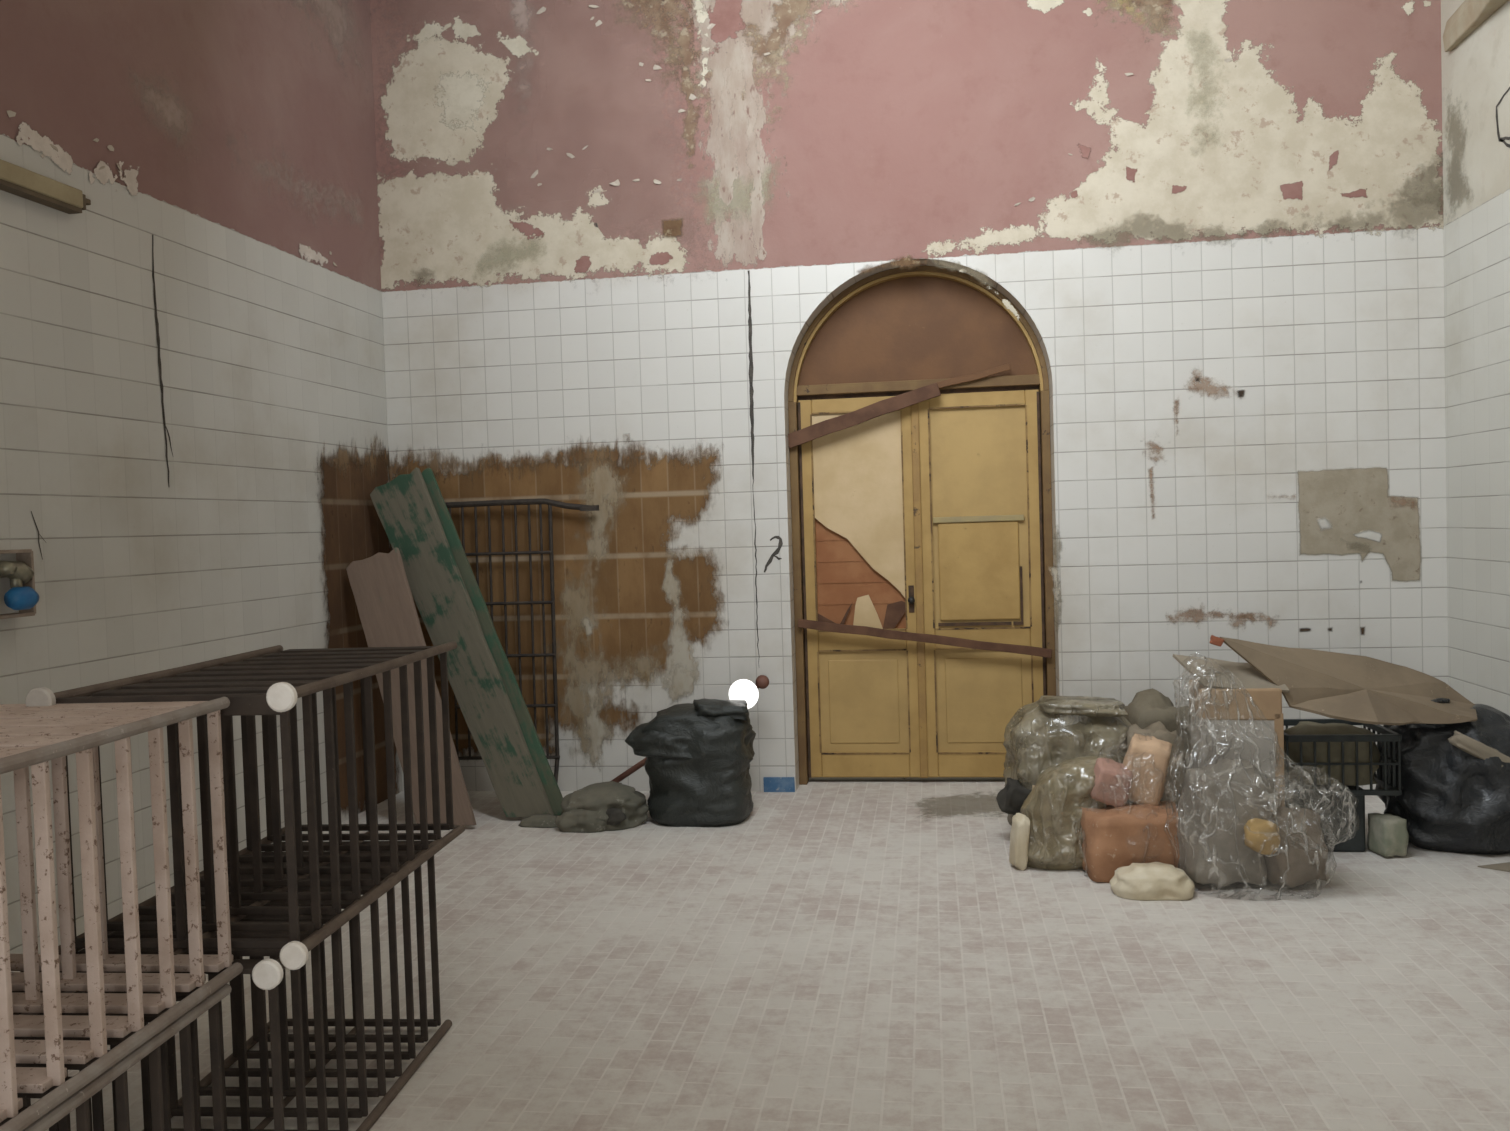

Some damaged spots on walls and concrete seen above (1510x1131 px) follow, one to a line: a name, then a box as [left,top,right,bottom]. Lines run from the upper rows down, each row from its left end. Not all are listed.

spalling [7,110,140,196]
peeling [377,0,847,290]
damp [619,0,718,167]
peeling [859,0,1444,273]
crack [152,235,173,486]
spalling [299,244,337,266]
flaking render [985,283,1020,319]
peeling [320,438,723,763]
crack [748,270,759,664]
peeling [1298,467,1421,581]
peeling [336,675,399,814]